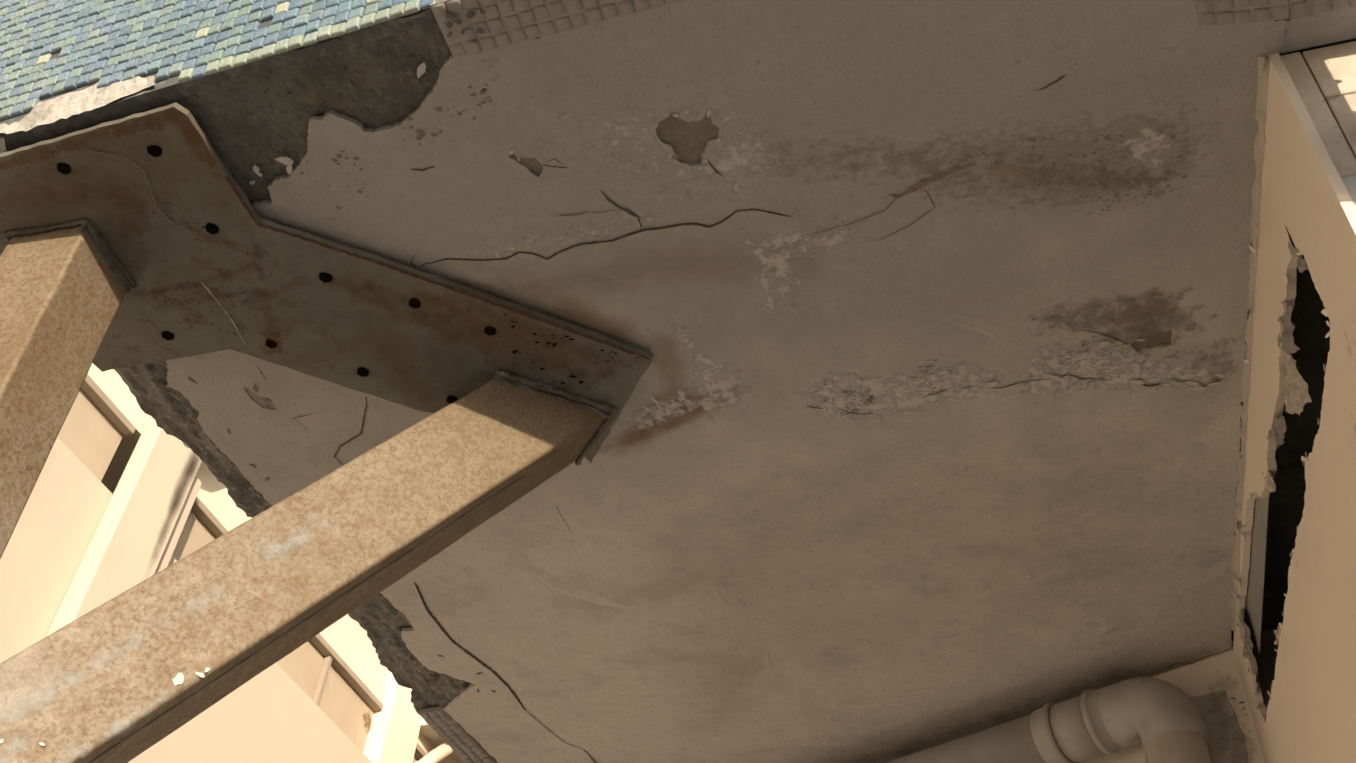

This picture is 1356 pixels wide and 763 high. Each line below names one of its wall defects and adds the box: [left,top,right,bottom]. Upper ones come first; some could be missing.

spalling [15,8,493,211]
corrosion [107,112,651,360]
flaking render [656,108,722,176]
crack [410,164,976,268]
damp [592,55,1188,211]
spalling [114,360,276,518]
flaking render [1130,330,1172,352]
flaking render [1229,56,1273,724]
spalling [1263,226,1312,492]
spalling [348,593,496,714]
crack [413,582,597,763]
spalling [1274,594,1287,652]